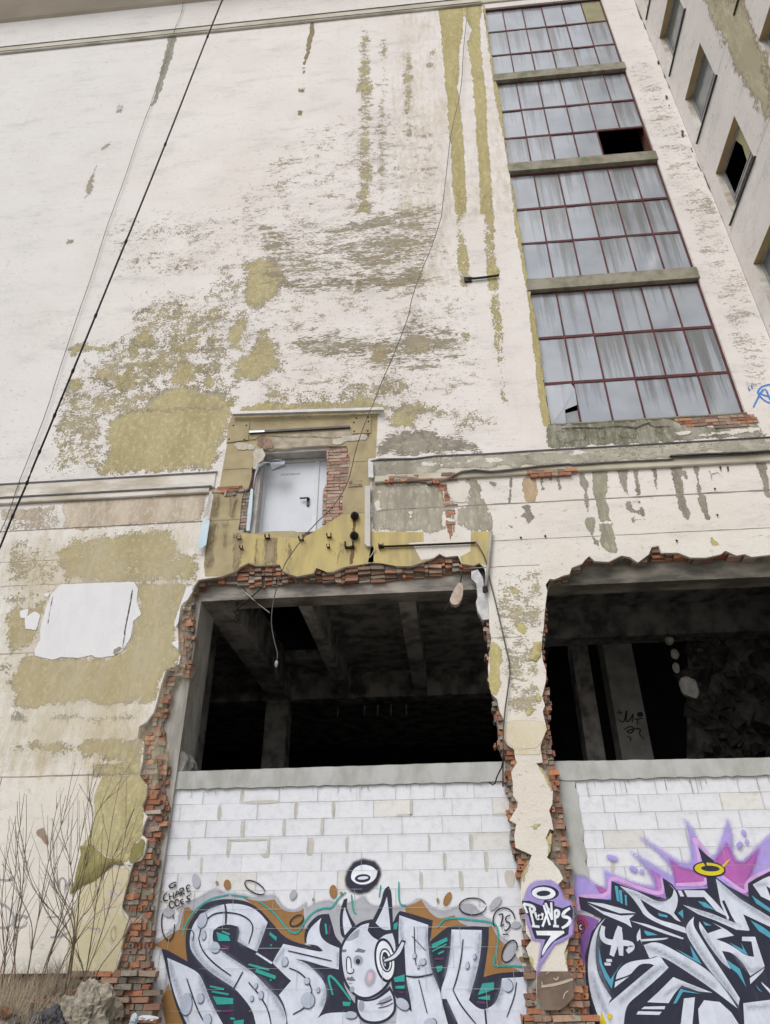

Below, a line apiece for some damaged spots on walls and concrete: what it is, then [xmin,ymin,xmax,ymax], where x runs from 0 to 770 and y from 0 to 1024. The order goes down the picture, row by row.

leakage [151,37,176,106]
leakage [438,4,508,402]
peeling [0,5,600,1024]
leakage [371,418,770,553]
spalling [547,547,770,593]
spalling [674,414,760,437]